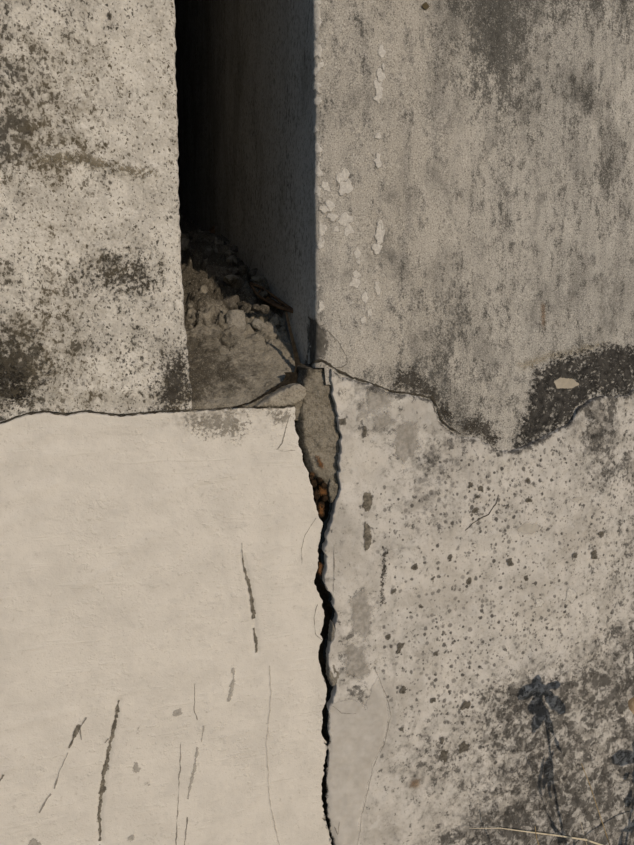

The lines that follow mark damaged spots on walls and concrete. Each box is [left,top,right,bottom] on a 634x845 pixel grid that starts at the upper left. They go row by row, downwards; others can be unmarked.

peeling [312,0,325,106]
peeling [373,45,386,103]
peeling [313,126,354,249]
peeling [349,246,381,324]
peeling [372,219,385,255]
leakage [0,323,56,421]
flaking render [254,282,346,489]
peeling [358,390,418,462]
leakage [393,365,501,449]
leakage [512,341,634,449]
crack [0,312,461,845]
peeling [350,546,388,638]